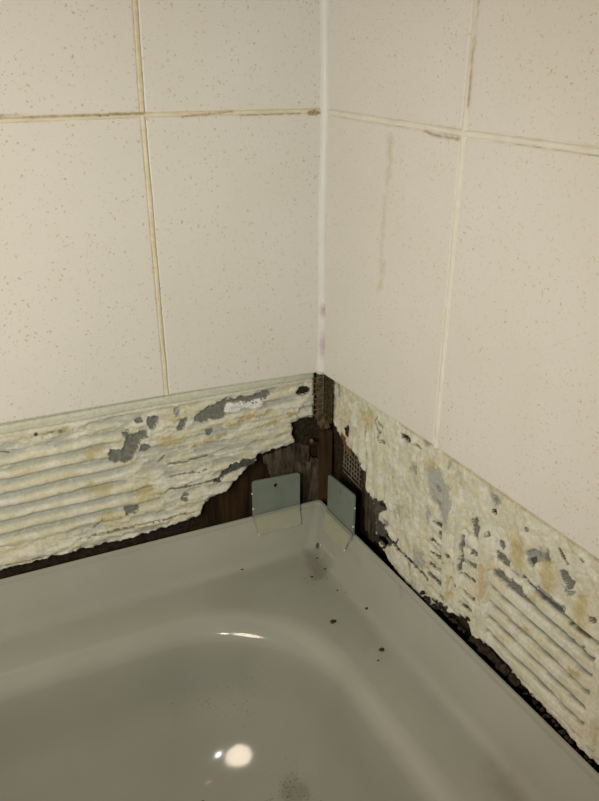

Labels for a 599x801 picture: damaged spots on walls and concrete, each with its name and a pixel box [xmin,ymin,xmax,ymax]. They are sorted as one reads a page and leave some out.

spalling [174,390,269,435]
spalling [108,416,158,462]
spalling [214,458,256,483]
spalling [373,498,393,546]
spalling [497,541,531,601]
spalling [529,549,541,567]
spalling [561,570,576,594]